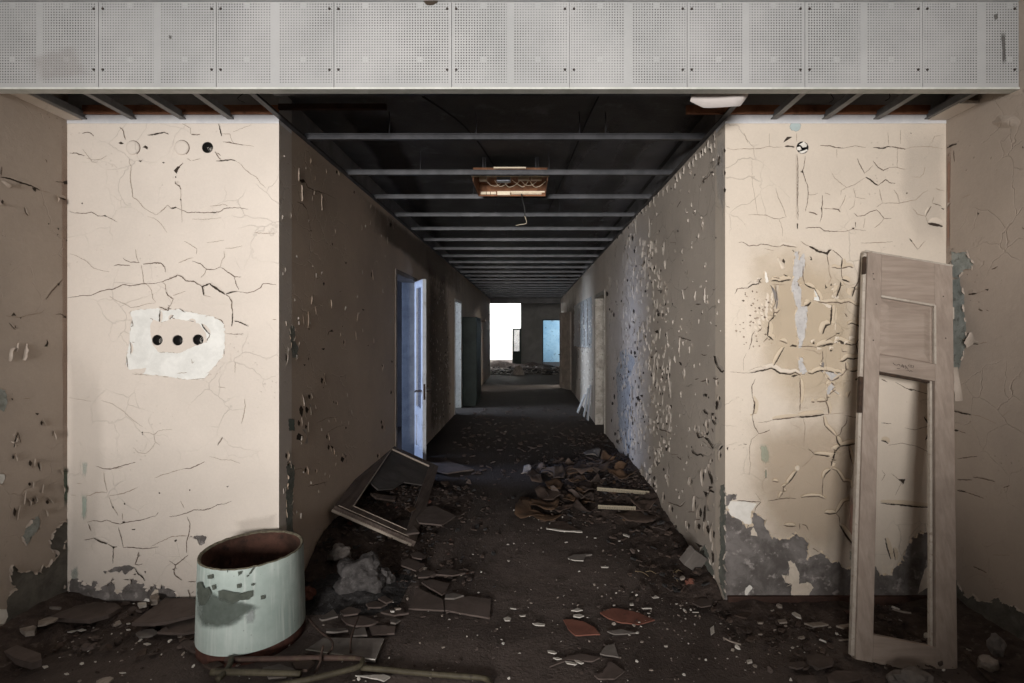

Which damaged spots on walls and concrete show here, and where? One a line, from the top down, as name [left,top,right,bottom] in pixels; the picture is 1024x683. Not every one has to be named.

crack [0,123,276,375]
peeling [286,298,316,362]
spalling [606,130,855,600]
crack [636,130,979,563]
peeling [950,248,976,401]
spalling [5,481,181,624]
crack [73,398,239,598]
spalling [874,531,927,595]
crack [954,407,1008,498]